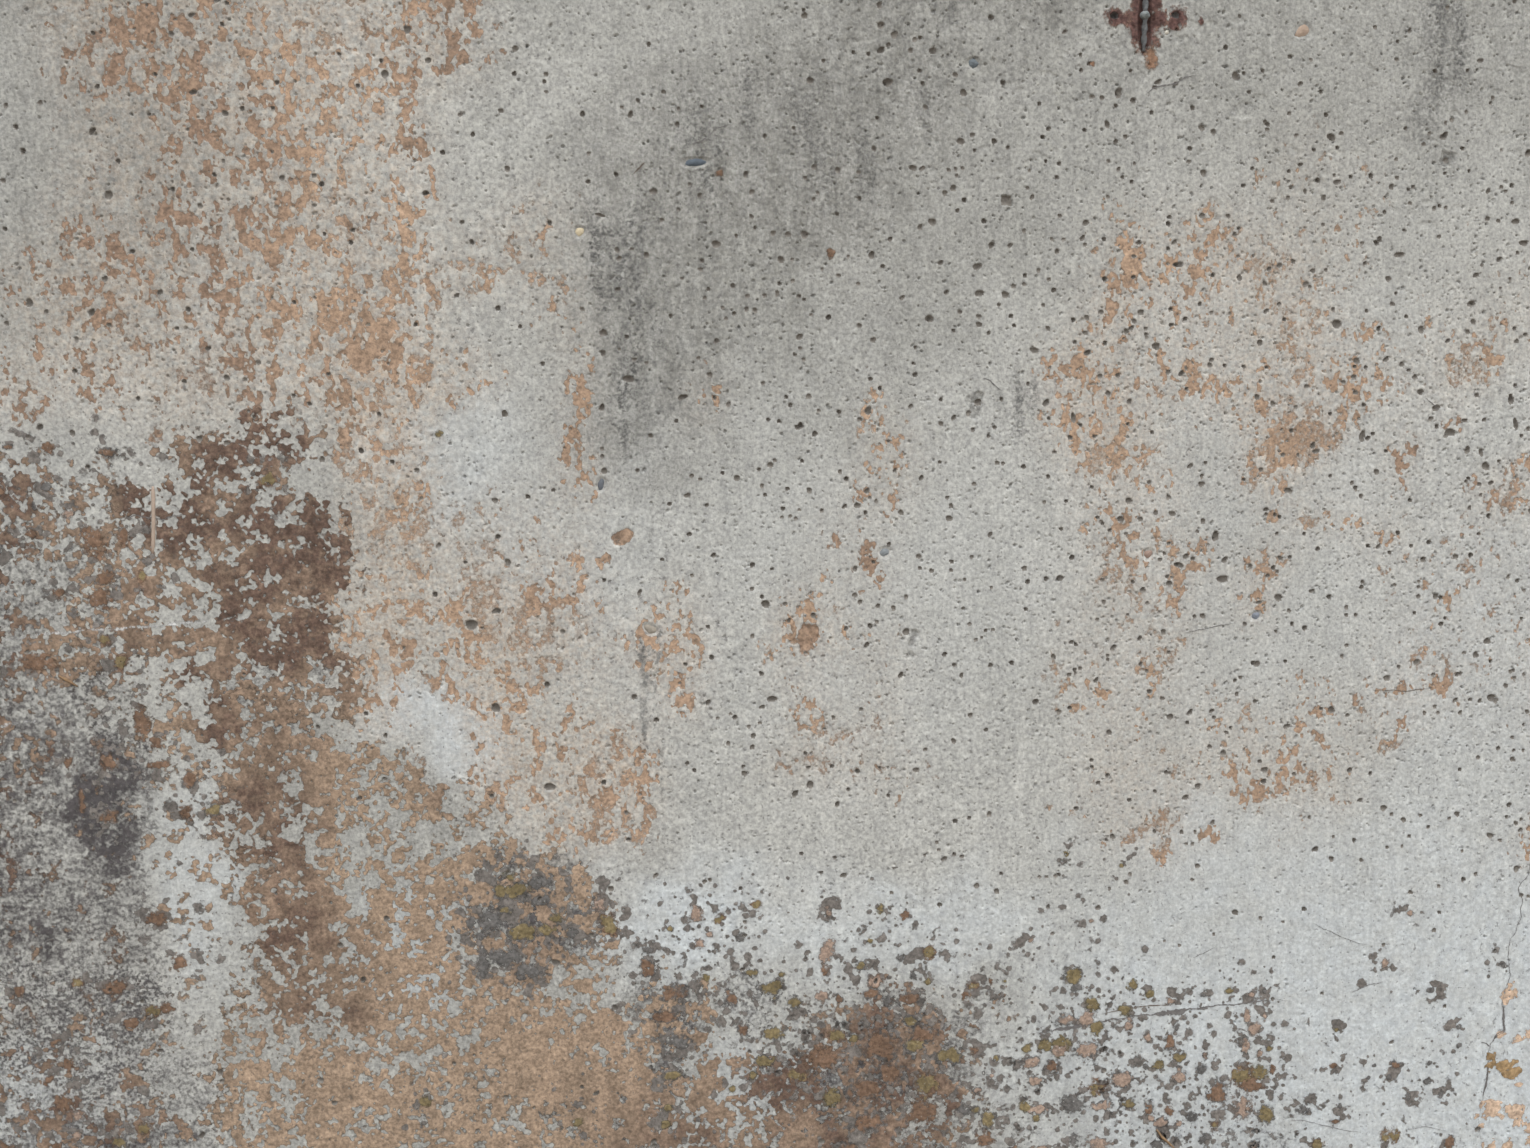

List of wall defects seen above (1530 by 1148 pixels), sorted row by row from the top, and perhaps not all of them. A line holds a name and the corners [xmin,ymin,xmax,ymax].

rust [1104,0,1204,69]
peeling [0,0,705,860]
peeling [852,387,908,593]
spalling [757,569,871,664]
water stain [0,404,1006,1148]
peeling [775,677,882,775]
crack [1478,869,1530,1148]